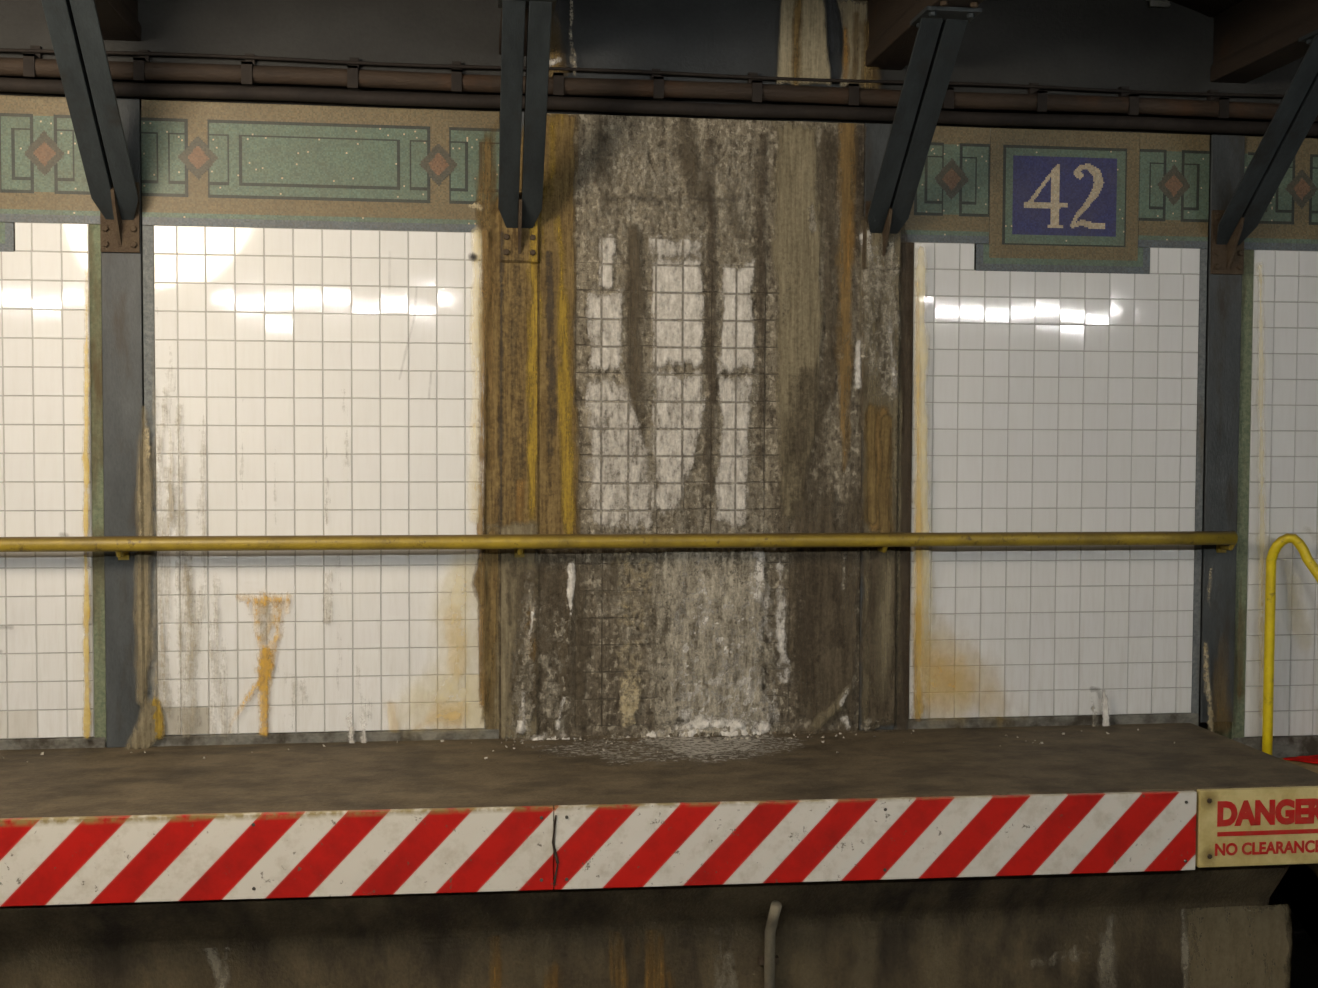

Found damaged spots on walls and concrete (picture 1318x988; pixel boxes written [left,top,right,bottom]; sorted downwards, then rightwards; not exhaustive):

peeling [777,0,878,89]
water stain [532,118,911,765]
water stain [152,567,196,707]
rust [243,595,289,736]